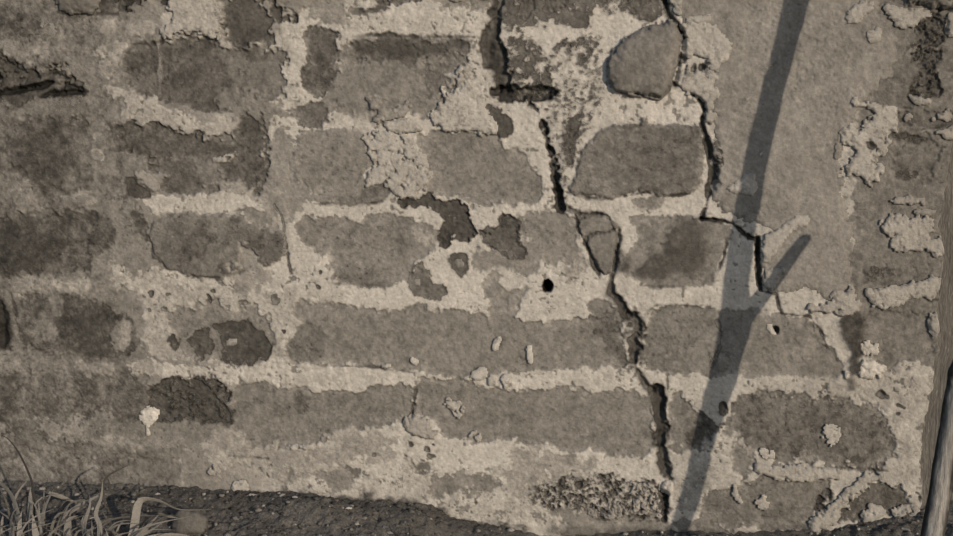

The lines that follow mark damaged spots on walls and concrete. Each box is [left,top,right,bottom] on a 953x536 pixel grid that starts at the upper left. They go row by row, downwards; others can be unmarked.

peeling [497,0,733,187]
peeling [834,0,953,188]
peeling [407,261,448,301]
peeling [361,65,527,278]
crack [479,0,673,523]
crack [661,0,838,368]
peeling [807,266,942,317]
peeling [879,194,944,258]
peeling [167,319,272,366]
spalling [139,376,236,436]
spalling [528,472,673,522]
peeling [754,448,918,533]